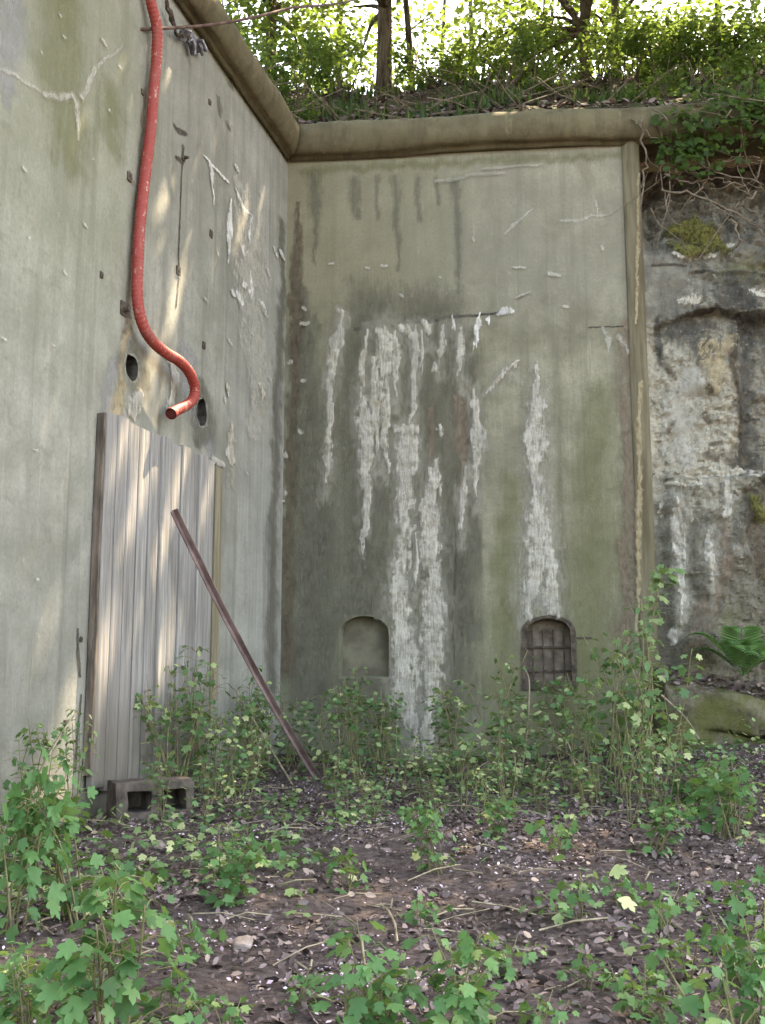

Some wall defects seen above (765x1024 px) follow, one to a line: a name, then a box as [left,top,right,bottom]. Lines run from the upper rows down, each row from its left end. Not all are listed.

damp [204,155,530,761]
damp [521,361,561,621]